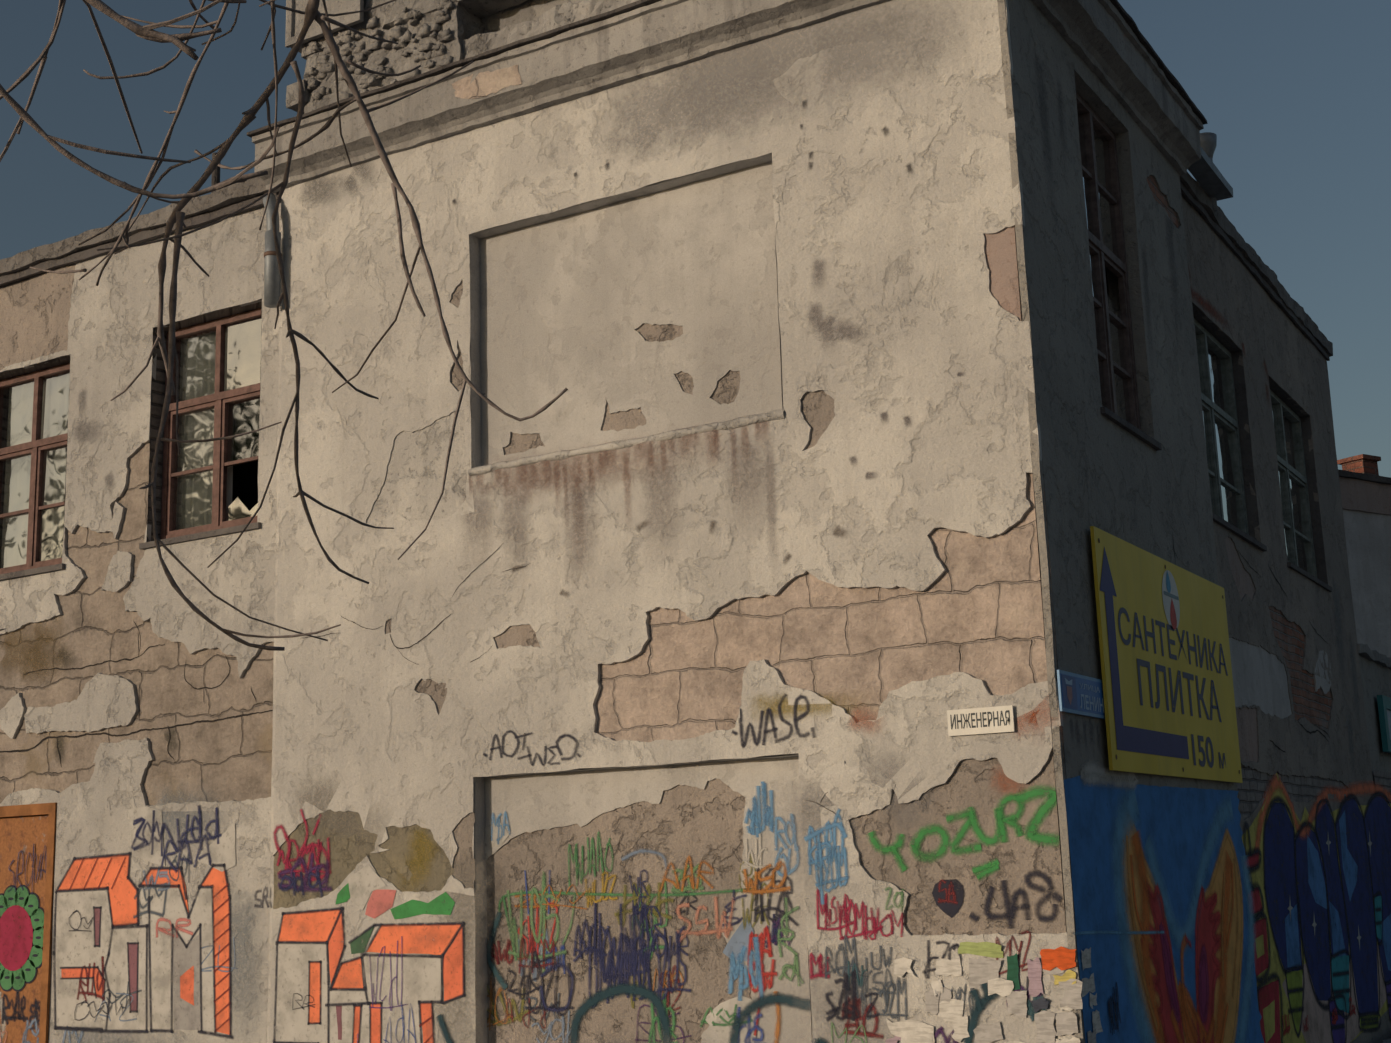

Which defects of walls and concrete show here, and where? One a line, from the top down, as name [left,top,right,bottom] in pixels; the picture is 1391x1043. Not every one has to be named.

flaking render [0,263,77,370]
flaking render [635,324,683,342]
flaking render [675,371,694,395]
flaking render [711,370,740,404]
flaking render [802,391,835,450]
flaking render [984,226,1024,321]
flaking render [0,442,274,806]
flaking render [494,625,540,648]
flaking render [596,473,1057,742]
peeling [1229,638,1347,820]
flaking render [850,726,1078,936]
flaking render [273,779,753,1043]